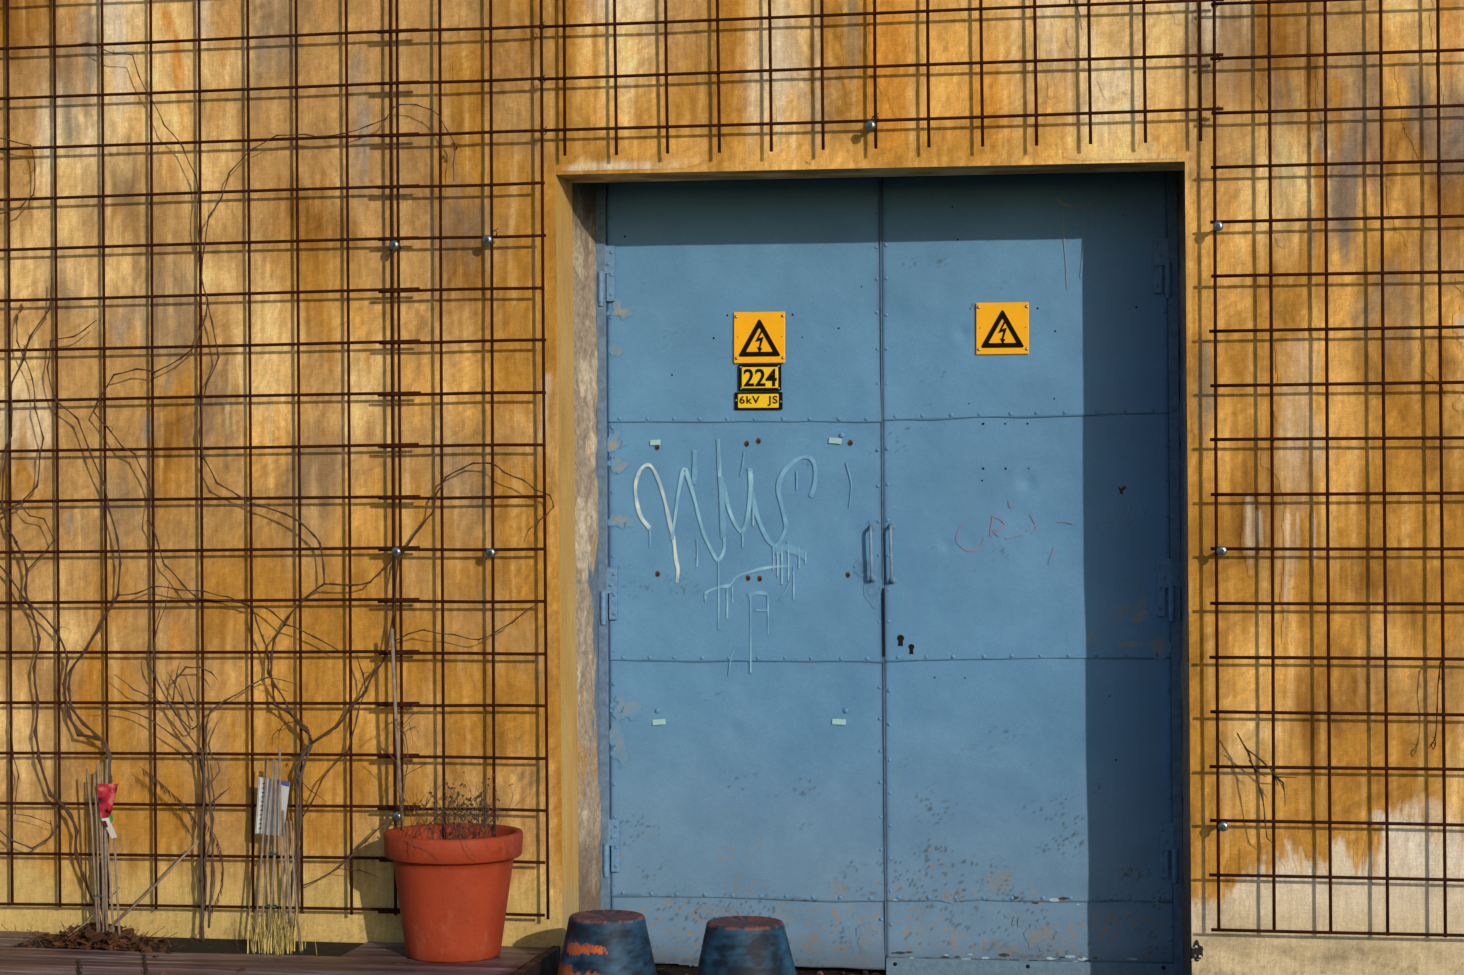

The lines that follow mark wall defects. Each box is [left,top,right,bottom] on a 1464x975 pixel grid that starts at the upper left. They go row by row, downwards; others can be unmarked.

corrosion [129,0,245,201]
corrosion [453,21,540,175]
corrosion [690,0,763,148]
corrosion [868,0,931,118]
corrosion [1306,56,1355,340]
water stain [1385,56,1445,246]
corrosion [1430,0,1464,133]
water stain [1419,332,1464,396]
corrosion [61,634,112,816]
peeling [1225,825,1333,900]
flaking render [1354,790,1464,883]
flaking render [1191,940,1203,962]